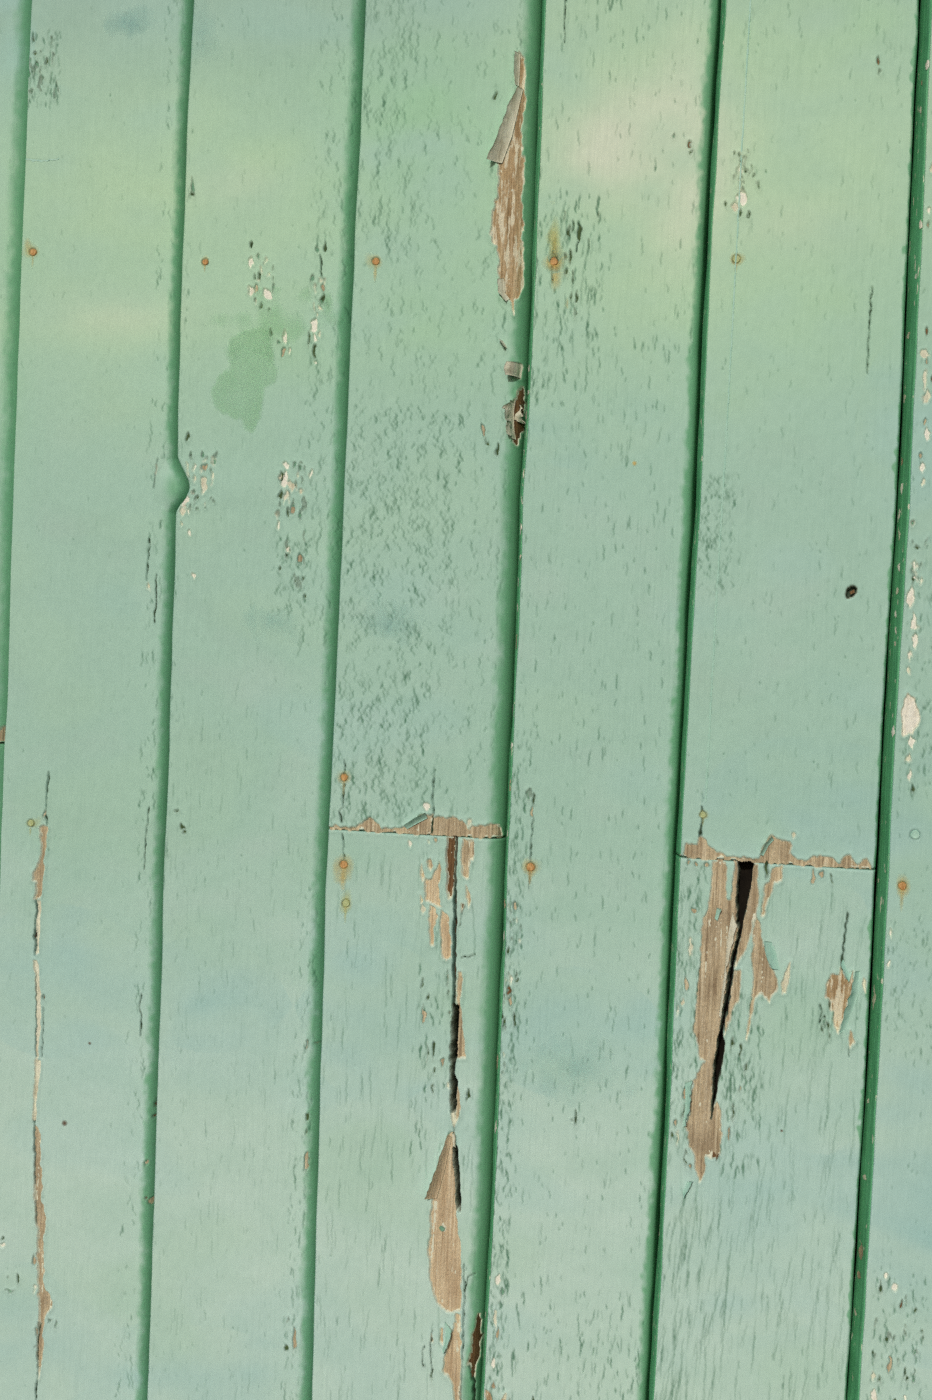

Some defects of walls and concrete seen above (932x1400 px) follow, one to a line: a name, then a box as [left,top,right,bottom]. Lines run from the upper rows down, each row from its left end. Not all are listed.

peeling [487,50,526,311]
peeling [671,808,879,1198]
peeling [422,1132,506,1400]